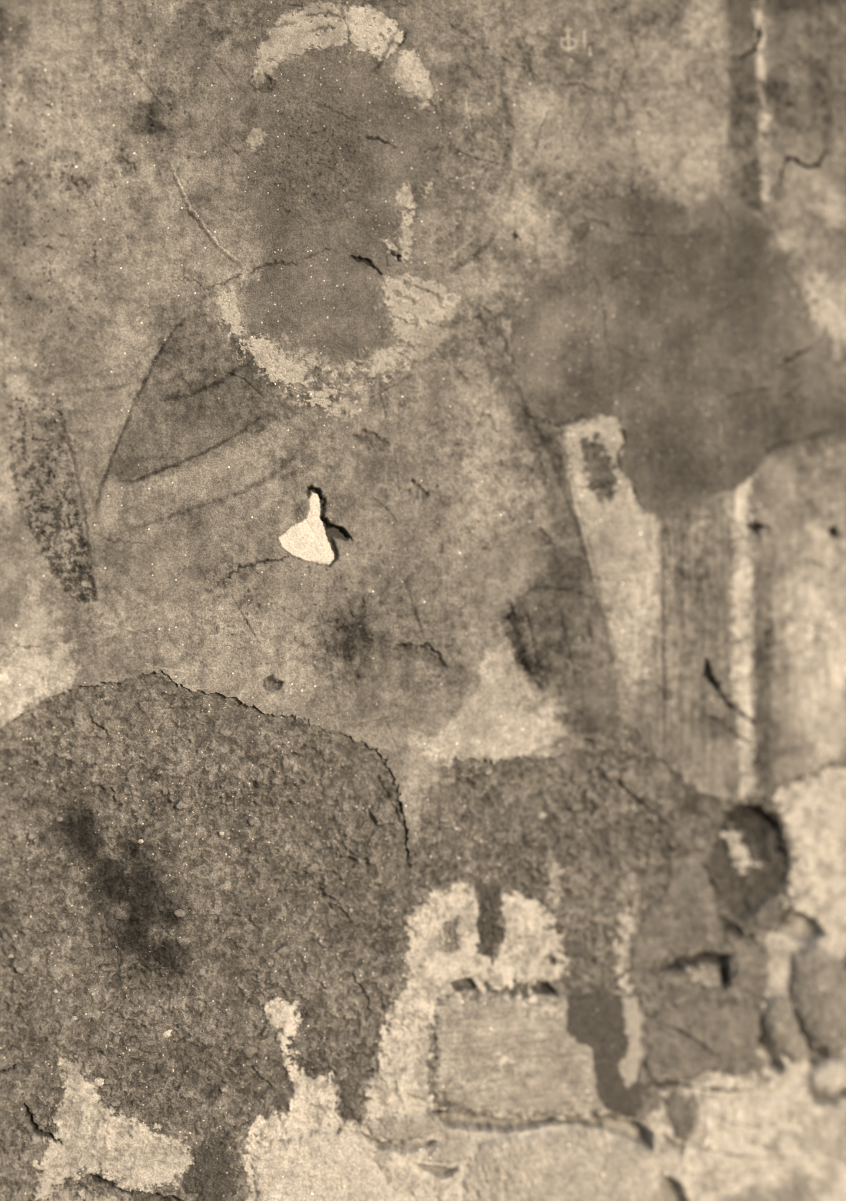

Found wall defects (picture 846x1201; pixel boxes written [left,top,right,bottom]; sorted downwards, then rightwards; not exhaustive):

peeling [247,1,438,111]
peeling [501,31,537,67]
peeling [751,7,767,49]
crack [775,145,836,242]
crack [177,245,401,317]
crack [469,261,673,577]
spalling [278,484,354,570]
crack [218,554,294,587]
peeling [389,641,449,682]
crack [702,658,760,747]
flaking render [0,670,807,1201]
crack [22,1101,67,1147]